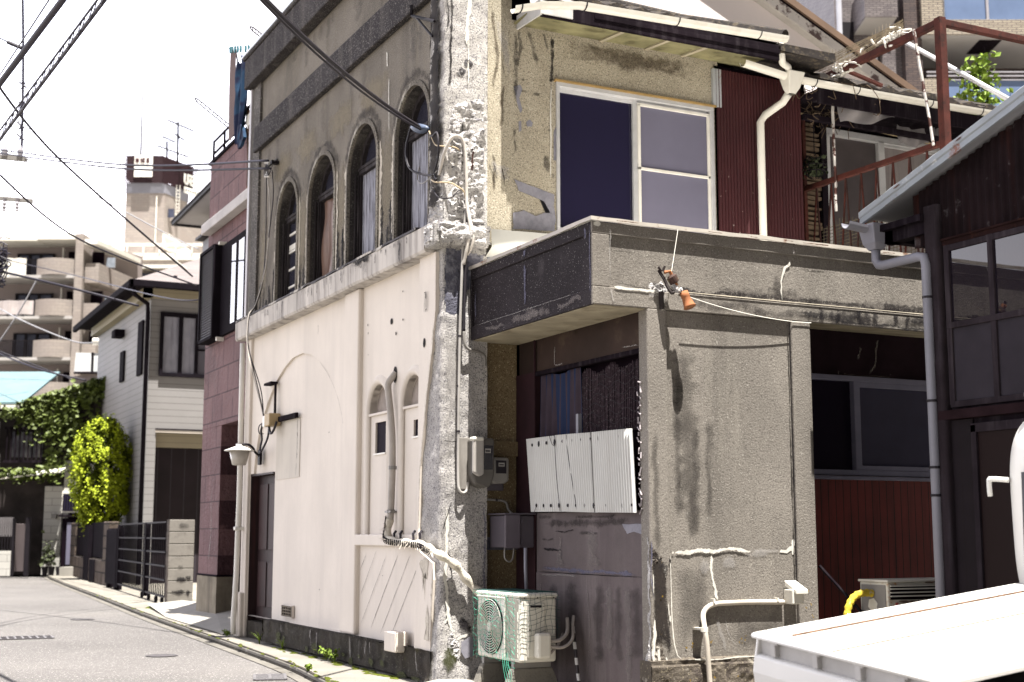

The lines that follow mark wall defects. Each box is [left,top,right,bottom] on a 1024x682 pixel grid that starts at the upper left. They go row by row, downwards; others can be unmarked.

leakage [590,46,677,74]
leakage [380,200,393,246]
spalling [423,95,491,315]
leakage [336,229,344,269]
leakage [681,287,924,331]
crack [780,539,795,555]
crack [669,547,754,660]